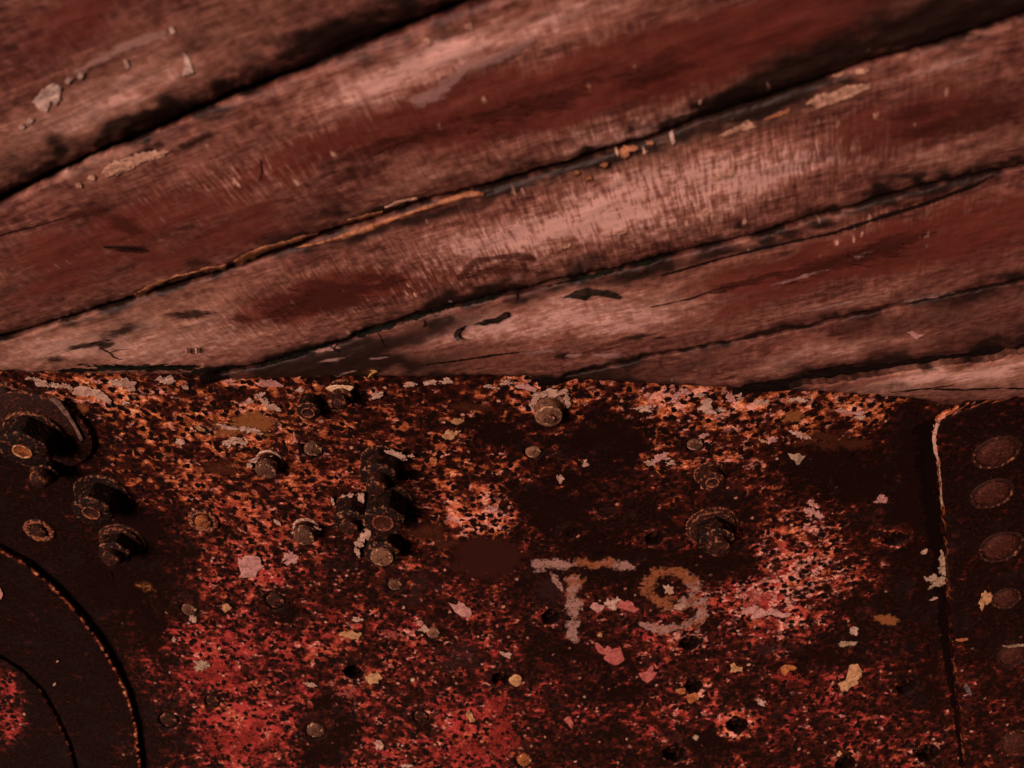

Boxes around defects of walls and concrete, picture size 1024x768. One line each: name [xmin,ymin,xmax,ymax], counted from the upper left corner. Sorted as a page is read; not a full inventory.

crack [661,174,995,276]
crack [651,286,732,308]
peeling [25,377,137,441]
peeling [245,379,305,412]
peeling [672,388,770,415]
peeling [921,548,946,601]
rust [889,419,964,768]
rust [871,614,899,625]
rust [562,632,654,703]
rust [774,640,861,671]
peeling [838,664,862,692]
rust [690,725,745,754]